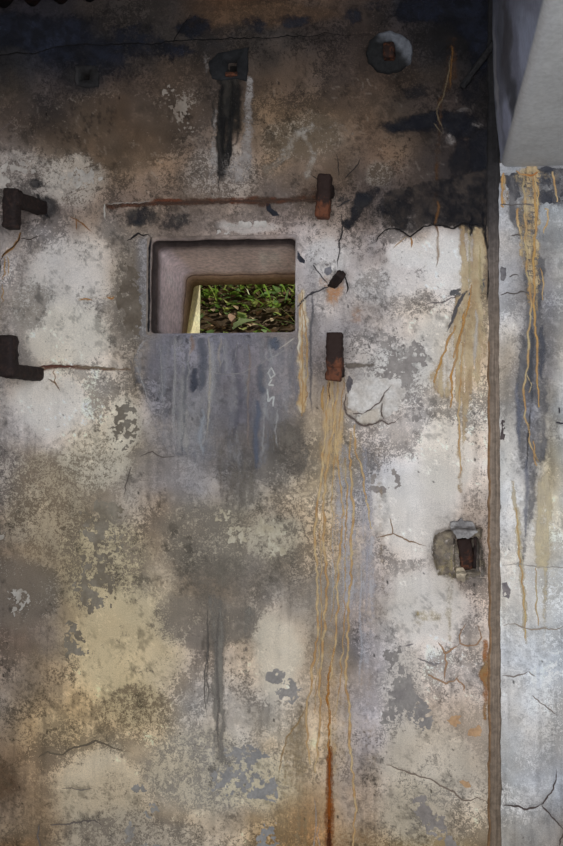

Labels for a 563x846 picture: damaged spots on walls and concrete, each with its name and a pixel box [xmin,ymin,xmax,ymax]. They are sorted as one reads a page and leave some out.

water stain [211,69,252,186]
crack [377,222,467,240]
rust [296,290,313,415]
crack [344,387,397,426]
rust [431,226,486,491]
rust [516,166,549,466]
rust [305,377,372,846]
spalling [432,529,486,580]
rust [511,472,552,638]
water stain [206,597,226,763]
crack [38,740,123,758]
crack [390,765,563,846]